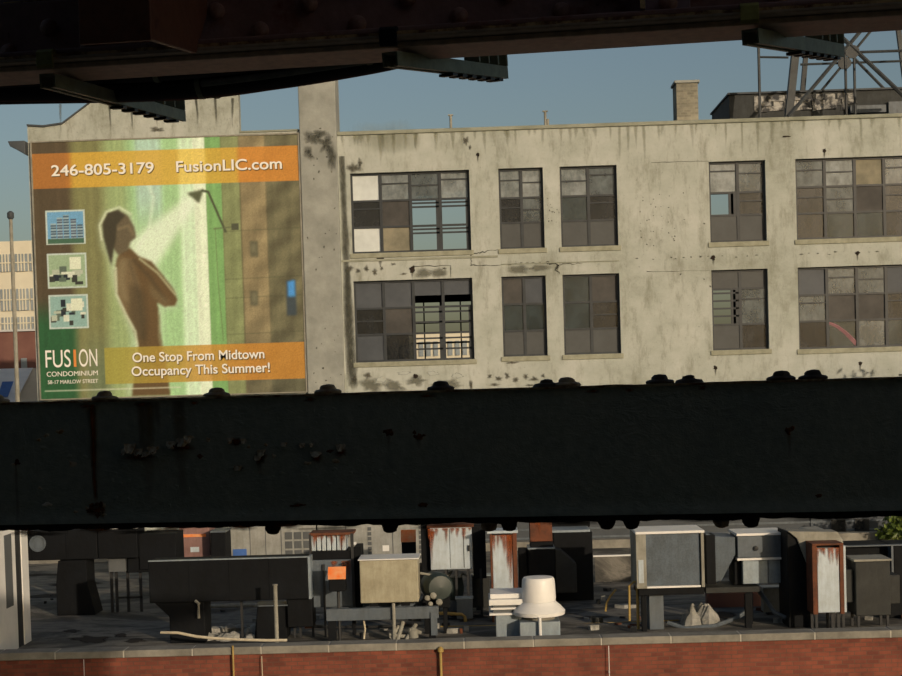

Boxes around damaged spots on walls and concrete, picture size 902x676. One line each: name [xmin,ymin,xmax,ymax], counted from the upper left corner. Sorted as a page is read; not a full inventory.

leakage [305,128,356,385]
rust [422,524,471,547]